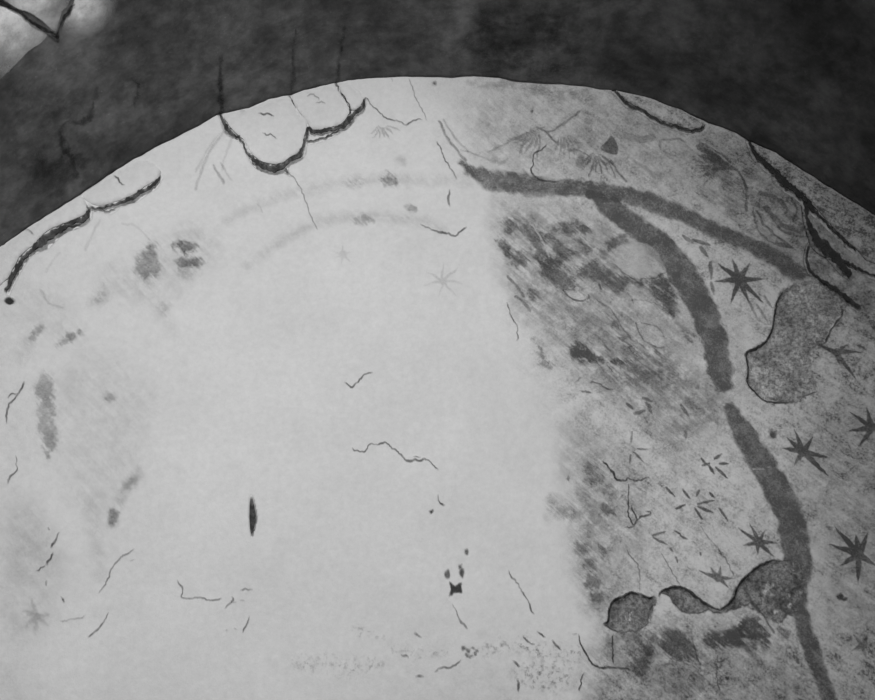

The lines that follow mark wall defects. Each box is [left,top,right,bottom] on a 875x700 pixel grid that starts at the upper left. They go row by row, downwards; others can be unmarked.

flaking render [224,83,364,166]
flaking render [618,93,705,129]
flaking render [0,161,161,286]
flaking render [753,145,875,264]
flaking render [744,282,848,405]
crack [354,441,436,468]
flaking render [603,559,804,633]